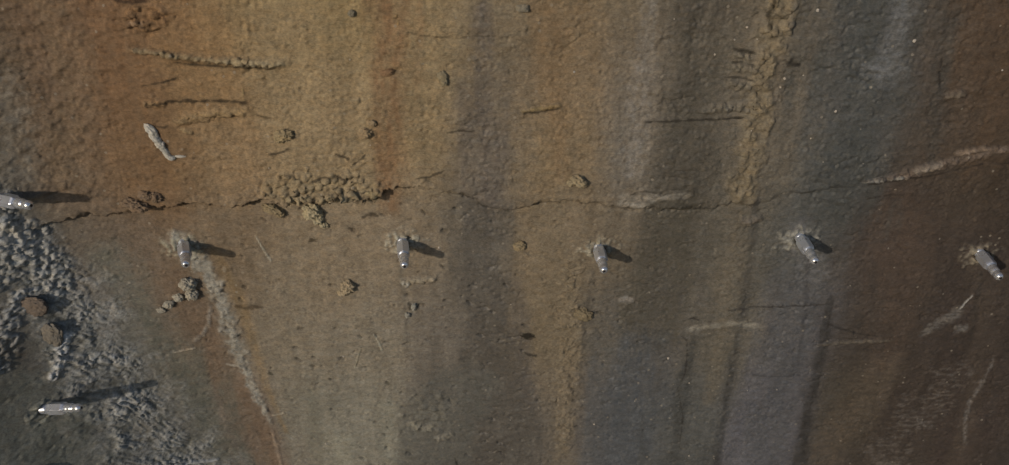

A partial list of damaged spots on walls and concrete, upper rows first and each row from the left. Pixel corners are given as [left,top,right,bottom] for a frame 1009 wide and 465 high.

crack [266,147,290,157]
crack [161,152,489,220]
crack [643,115,749,125]
crack [517,162,1009,211]
crack [31,212,136,230]
water stain [0,66,284,465]
water stain [302,0,556,465]
water stain [573,0,968,465]